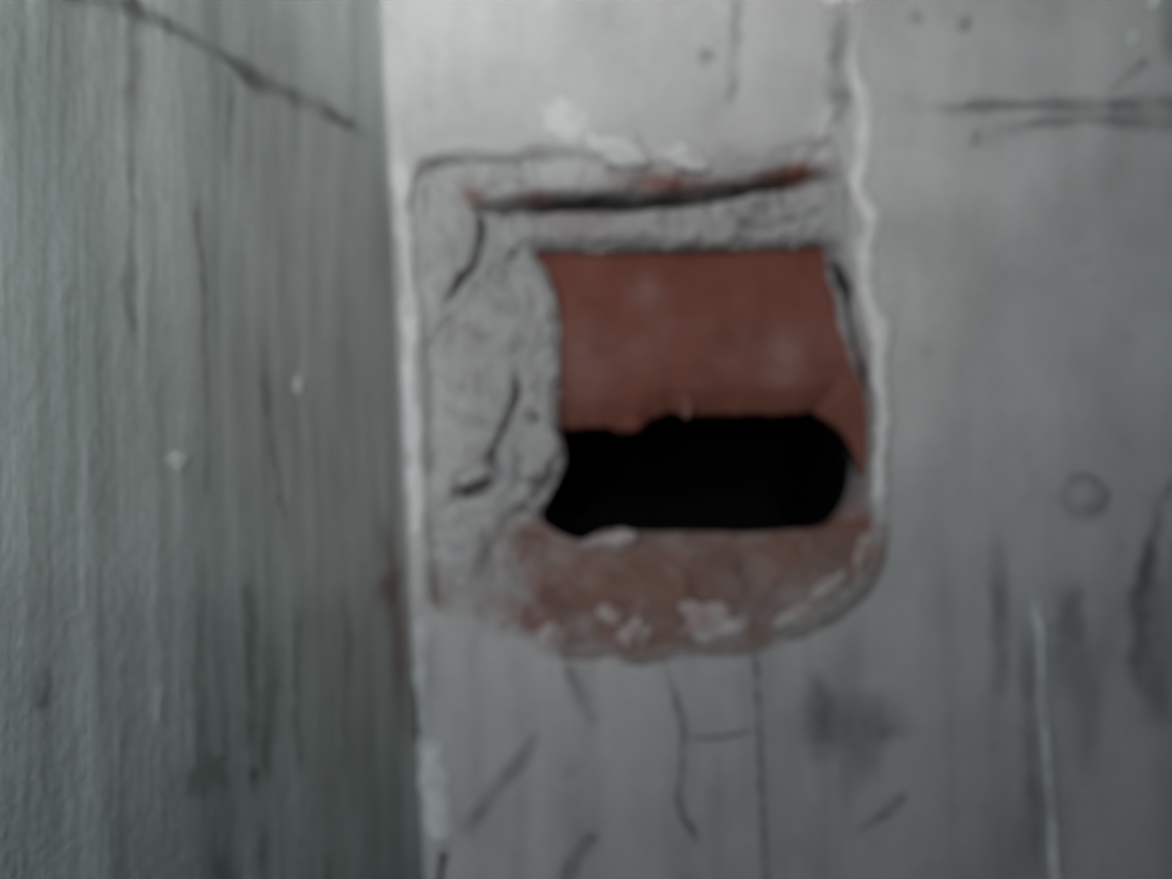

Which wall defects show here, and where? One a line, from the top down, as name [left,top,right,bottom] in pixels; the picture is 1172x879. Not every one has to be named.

spalling [408,96,892,660]